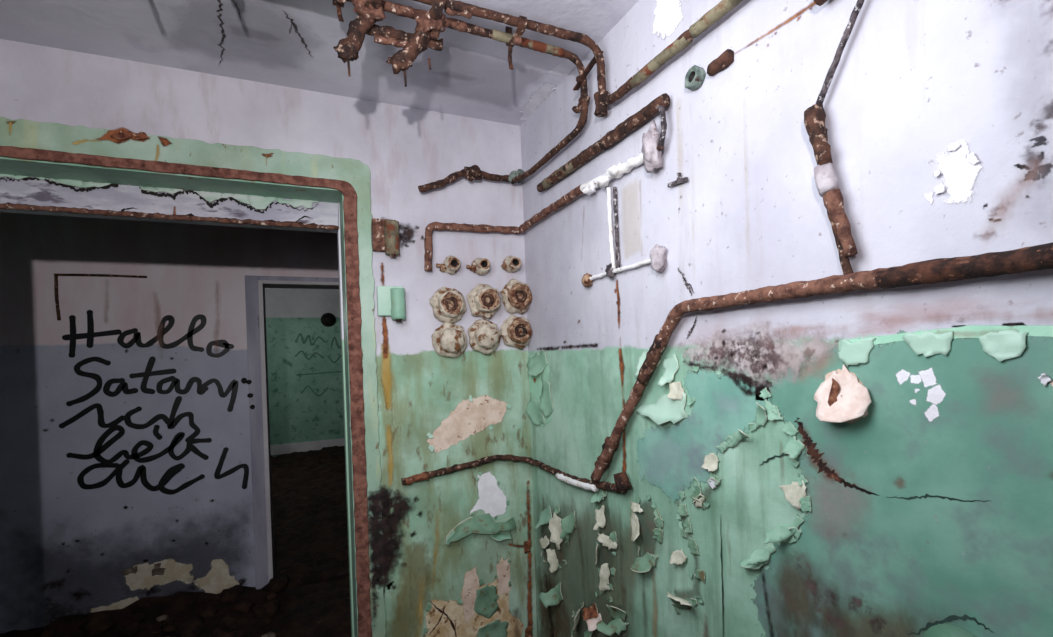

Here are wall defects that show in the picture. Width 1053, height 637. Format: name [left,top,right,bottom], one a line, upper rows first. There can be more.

crack [216,0,242,65]
crack [282,10,311,56]
rust [73,127,172,161]
damp [1038,102,1053,129]
crack [219,216,315,225]
mould [683,326,837,395]
peeling [426,395,512,453]
crack [794,418,880,496]
peeling [630,325,1053,637]
flaking render [90,559,239,613]
peeling [533,504,576,608]
peeling [571,489,629,637]